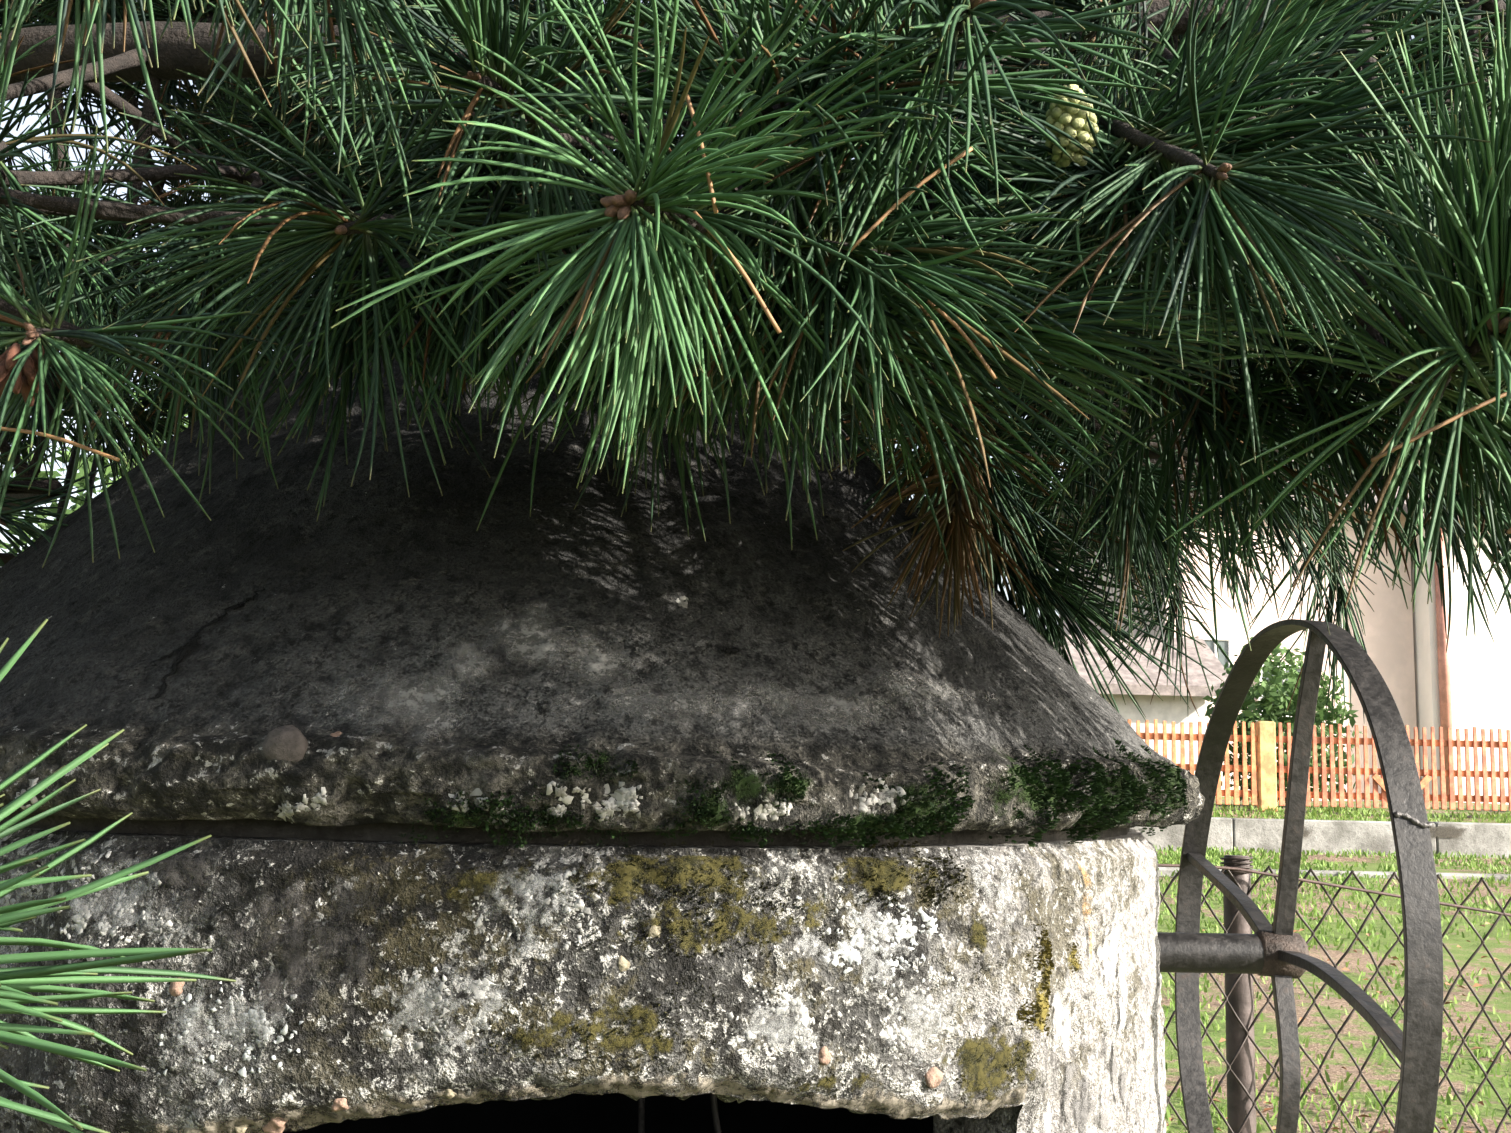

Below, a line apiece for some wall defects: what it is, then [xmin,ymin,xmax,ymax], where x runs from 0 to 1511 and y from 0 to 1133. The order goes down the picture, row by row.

crack [151,583,271,699]